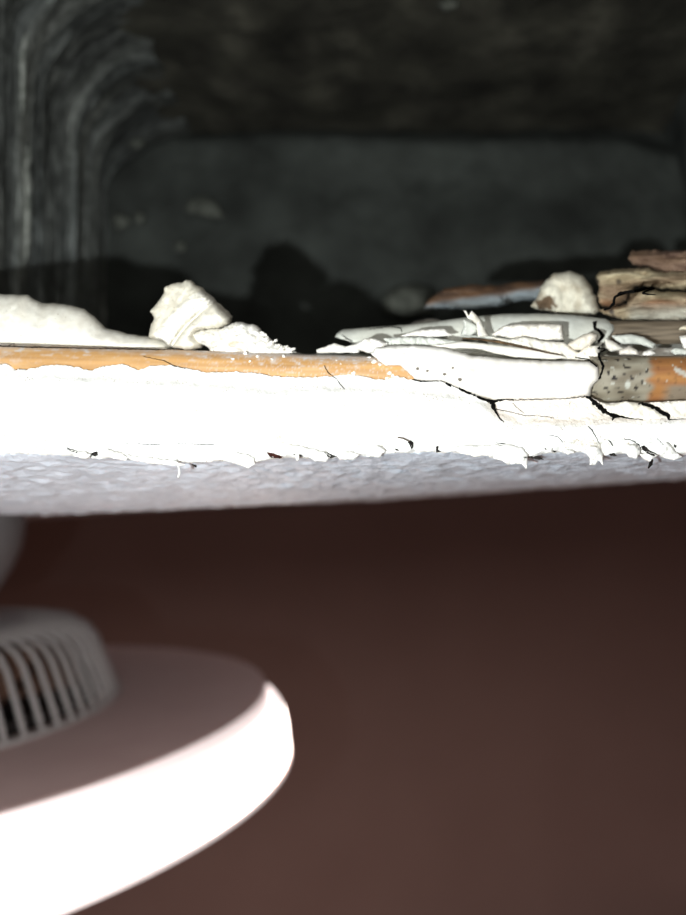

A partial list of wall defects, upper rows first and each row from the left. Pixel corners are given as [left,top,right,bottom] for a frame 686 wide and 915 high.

peeling [464,310,488,337]
crack [412,286,678,453]
peeling [66,447,197,478]
peeling [230,452,255,469]
peeling [267,437,414,462]
peeling [452,442,682,469]